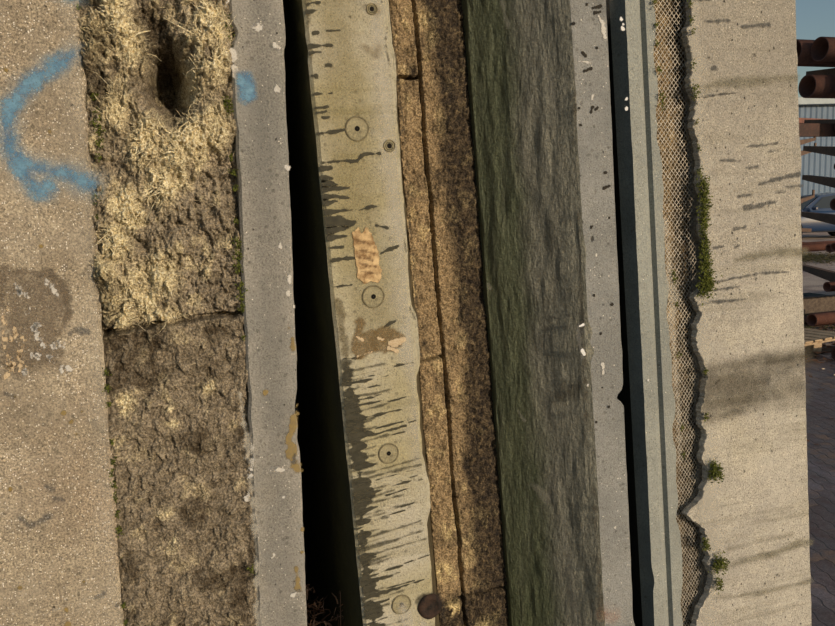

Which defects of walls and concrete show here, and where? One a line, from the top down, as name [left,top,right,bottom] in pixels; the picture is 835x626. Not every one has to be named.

peeling [352,318,406,359]
leakage [341,357,429,626]
corrosion [417,594,445,622]